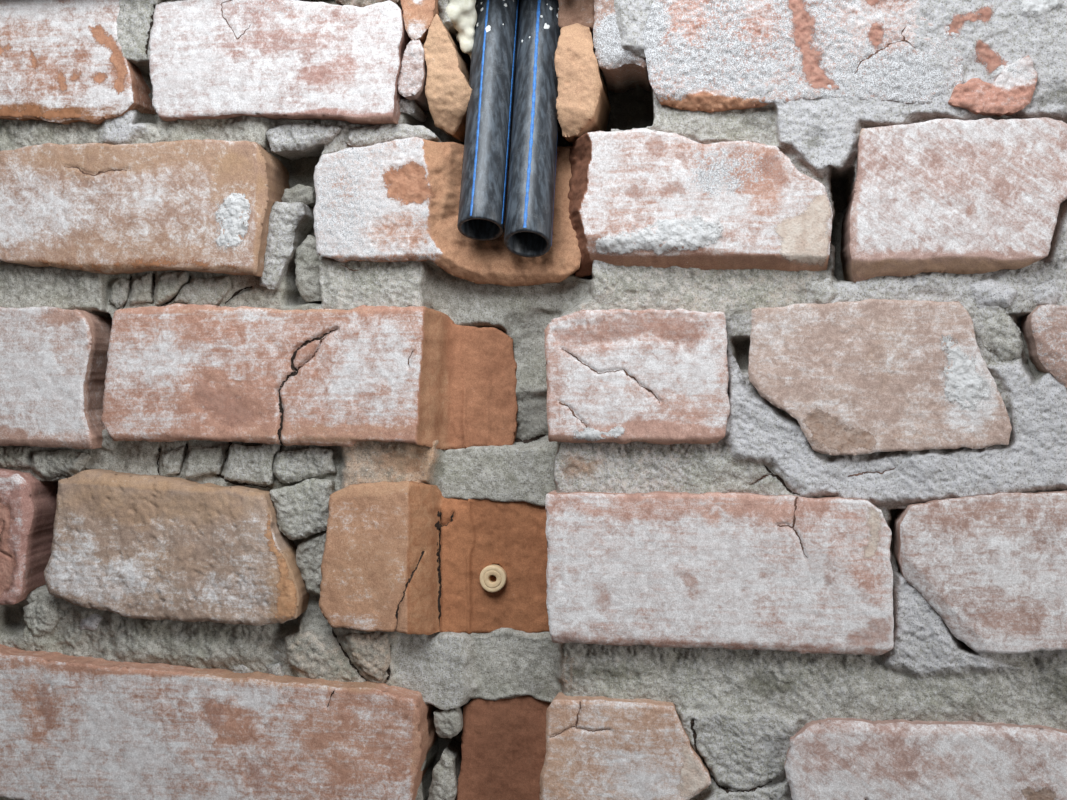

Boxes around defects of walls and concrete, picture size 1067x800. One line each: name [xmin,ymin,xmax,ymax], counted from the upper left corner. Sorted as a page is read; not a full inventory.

crack [220,0,251,39]
spalling [788,0,839,90]
spalling [867,22,884,49]
crack [855,27,916,74]
spalling [946,6,993,36]
spalling [975,40,1007,73]
crack [277,330,335,450]
crack [563,349,660,403]
crack [217,442,268,488]
crack [750,465,807,557]
crack [332,511,454,681]
crack [550,701,610,737]